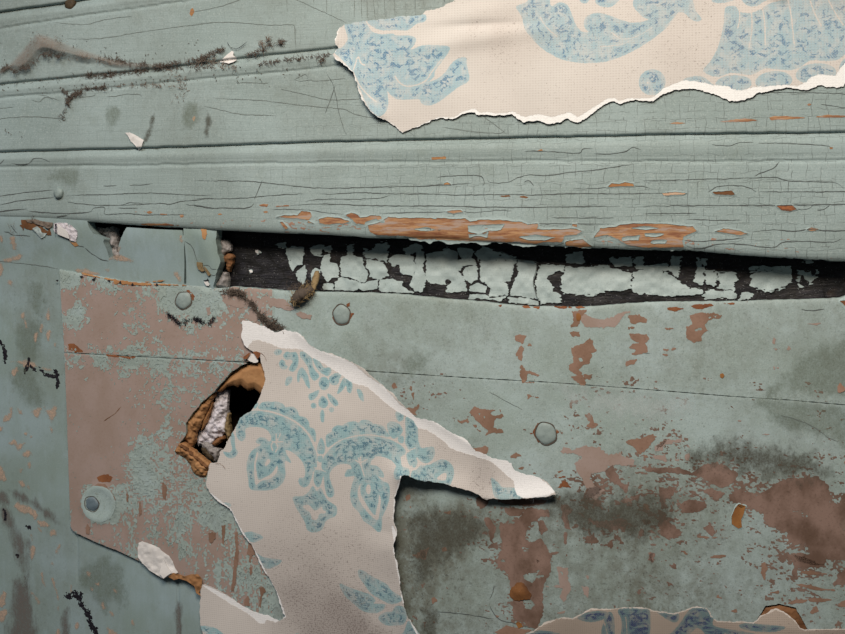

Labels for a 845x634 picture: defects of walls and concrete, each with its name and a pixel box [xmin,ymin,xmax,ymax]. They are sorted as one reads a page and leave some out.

crack [204,74,388,129]
crack [0,147,845,249]
crack [496,251,538,298]
peeling [33,239,312,618]
peeling [259,204,845,634]
damp [712,444,822,474]